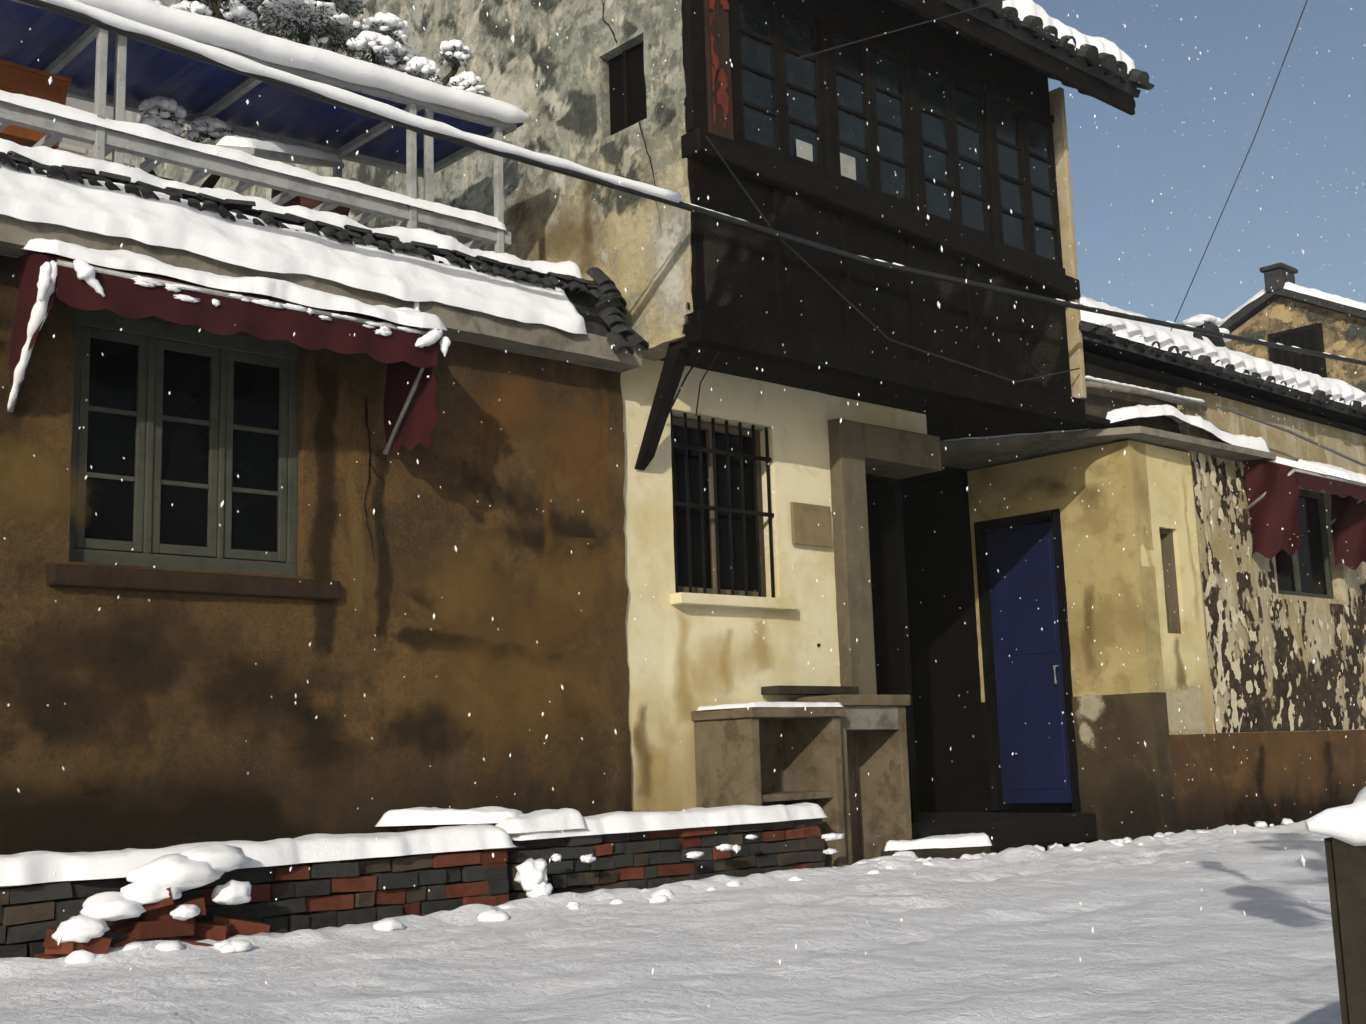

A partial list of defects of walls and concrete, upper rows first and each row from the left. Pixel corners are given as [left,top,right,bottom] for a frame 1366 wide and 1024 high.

mould [414,5,456,36]
mould [478,0,648,217]
mould [654,102,676,134]
mould [350,164,395,188]
mould [350,209,398,228]
leakage [347,397,391,634]
peeling [1191,453,1366,733]
leakage [17,622,176,737]
leakage [207,659,342,758]